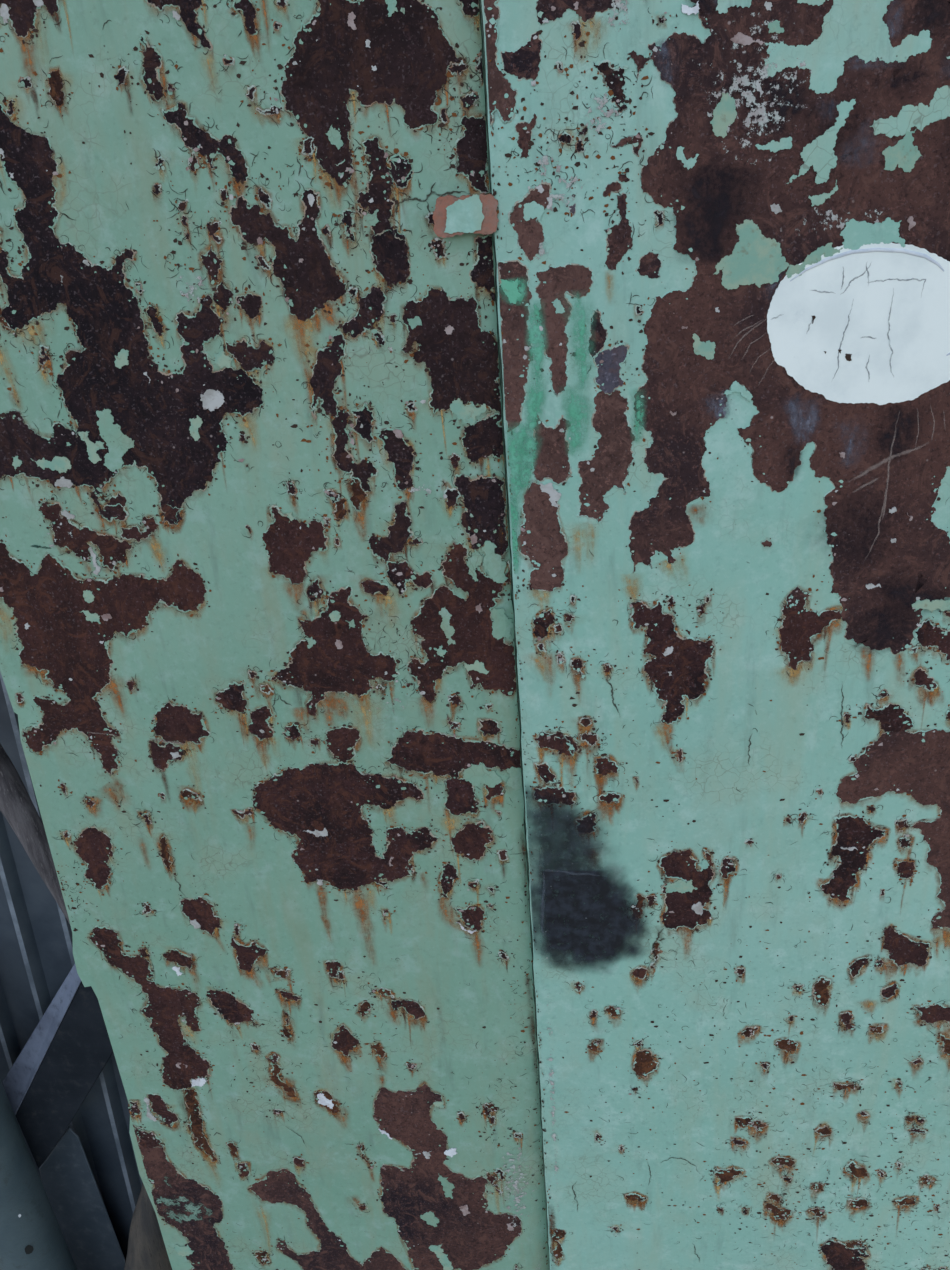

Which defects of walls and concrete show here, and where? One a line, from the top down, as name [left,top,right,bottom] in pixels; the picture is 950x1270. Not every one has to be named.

peeling [440,52,484,130]
peeling [558,126,588,153]
peeling [610,131,644,157]
peeling [603,173,630,197]
corrosion [139,0,950,982]
corrosion [73,826,114,894]
peeling [894,819,916,905]
corrosion [913,1003,950,1068]
corrosion [88,925,259,1270]
peeling [226,1141,250,1179]
corrosion [248,1077,522,1270]
corrosion [820,1239,870,1270]